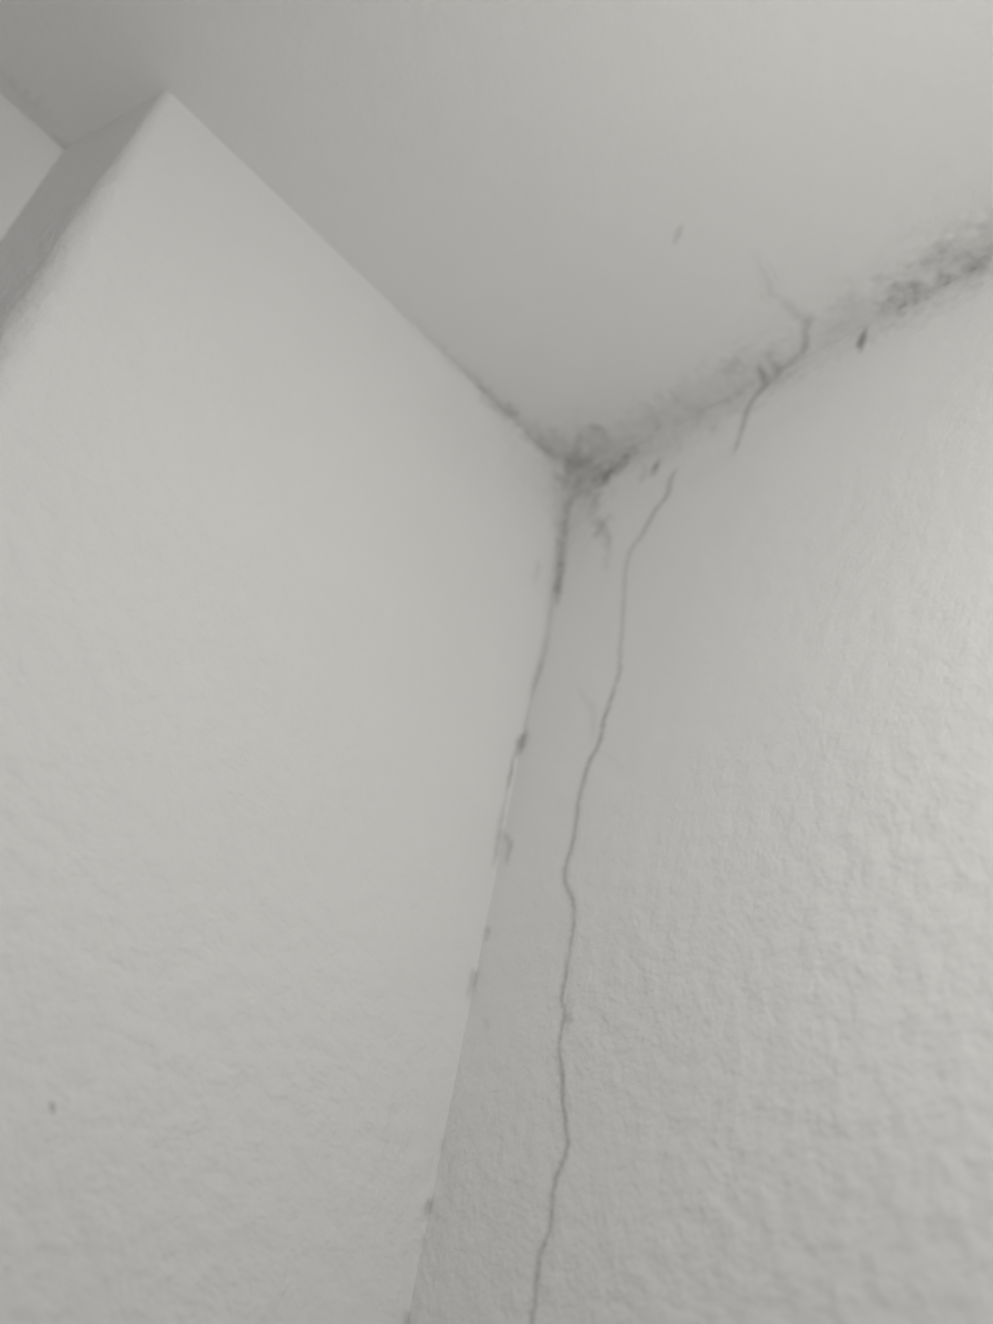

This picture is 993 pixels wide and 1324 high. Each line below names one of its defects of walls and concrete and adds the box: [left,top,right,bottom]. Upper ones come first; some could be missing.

damp [394,175,993,580]
crack [464,923,494,1034]
crack [489,466,682,1324]